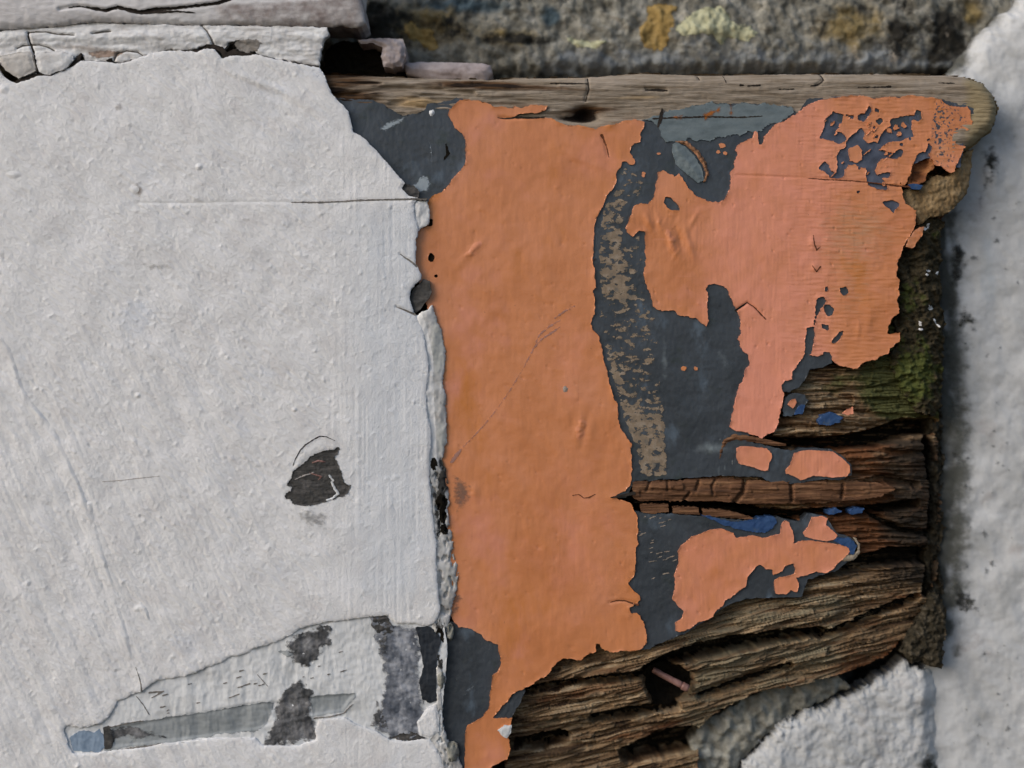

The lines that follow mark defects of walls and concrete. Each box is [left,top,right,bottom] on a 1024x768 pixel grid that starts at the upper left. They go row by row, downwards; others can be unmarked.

crack [16,0,255,83]
peeling [336,98,466,203]
peeling [819,97,922,213]
peeling [914,139,963,171]
crack [291,196,427,204]
peeling [903,227,924,249]
peeling [410,274,438,313]
peeling [591,96,852,498]
peeling [284,436,351,506]
hole [435,493,448,535]
peeling [628,506,864,651]
peeling [64,615,525,768]